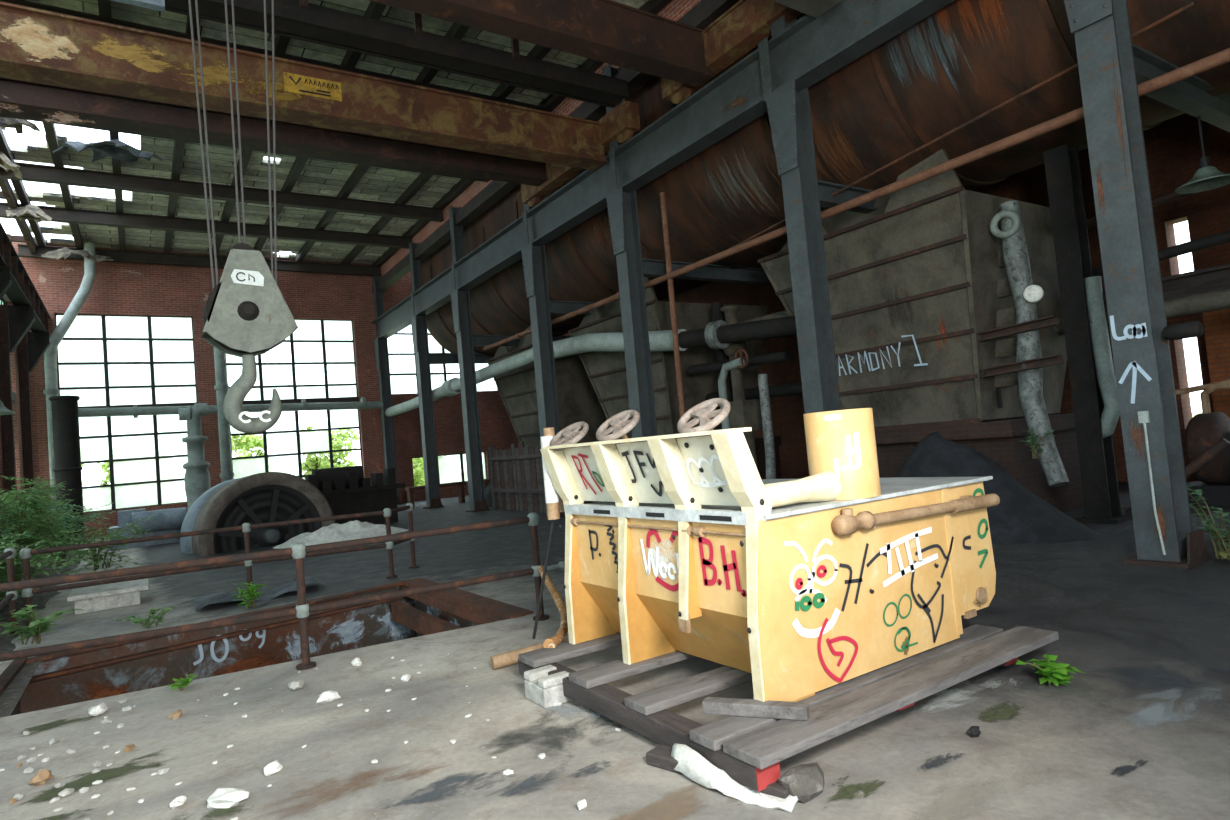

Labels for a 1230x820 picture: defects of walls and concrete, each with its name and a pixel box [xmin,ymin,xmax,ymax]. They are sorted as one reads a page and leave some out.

peeling [0,16,304,103]
rust [887,0,1010,88]
rust [86,684,127,701]
rust [219,655,281,675]